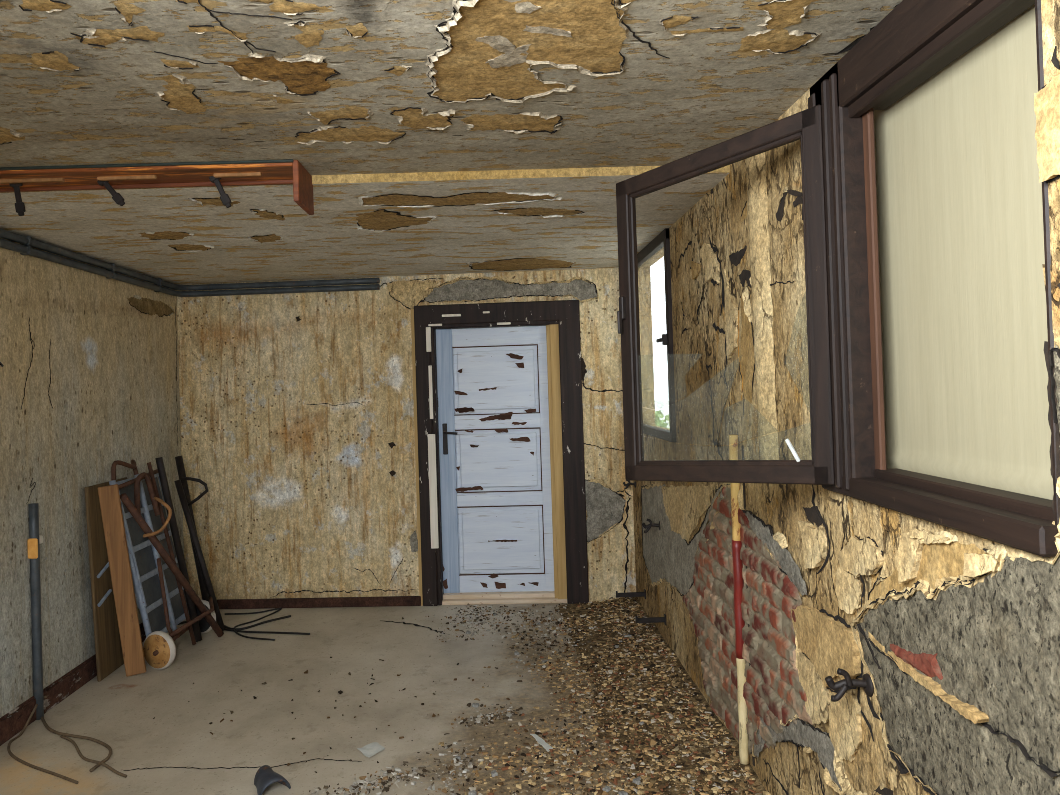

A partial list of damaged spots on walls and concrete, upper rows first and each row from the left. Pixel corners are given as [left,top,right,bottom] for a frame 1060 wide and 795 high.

crack [154,51,218,64]
crack [198,0,292,53]
peeling [294,0,636,145]
crack [611,0,669,58]
peeling [1034,74,1060,183]
peeling [356,192,585,231]
flaking render [423,258,599,303]
flaking render [585,479,626,543]
flaking render [641,341,1060,795]
crack [819,536,939,795]
crack [750,740,825,795]
crack [981,722,1060,778]